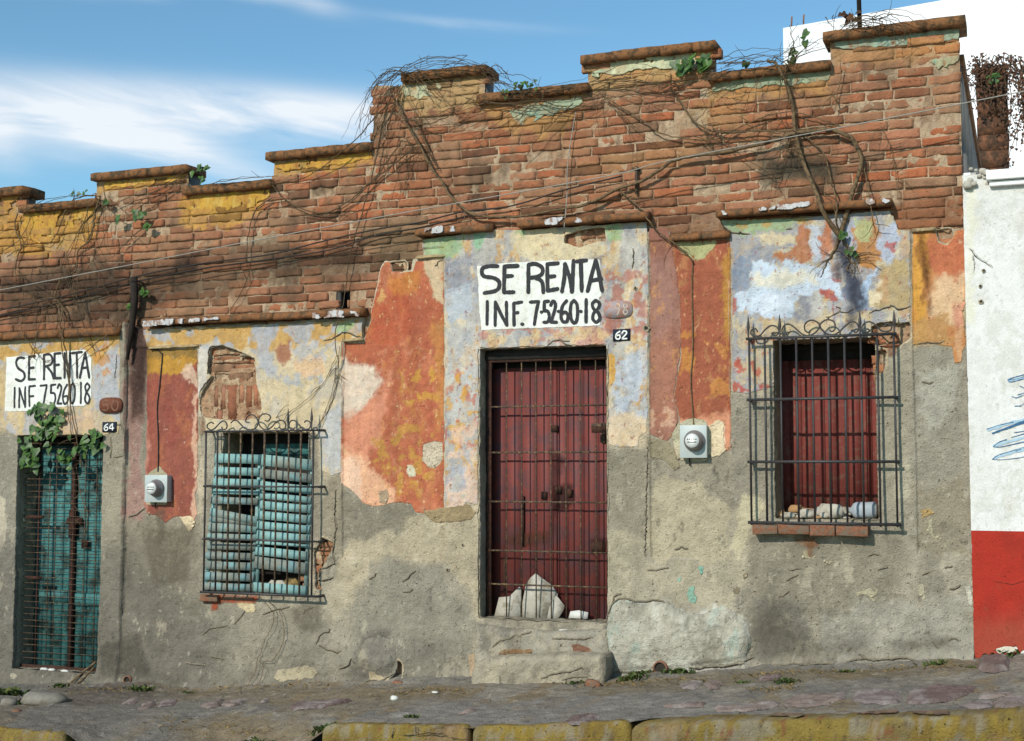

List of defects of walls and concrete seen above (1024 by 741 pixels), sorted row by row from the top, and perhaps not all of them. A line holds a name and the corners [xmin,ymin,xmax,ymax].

peeling [142,198,985,532]
flaking render [313,536,334,595]
crack [185,606,395,683]